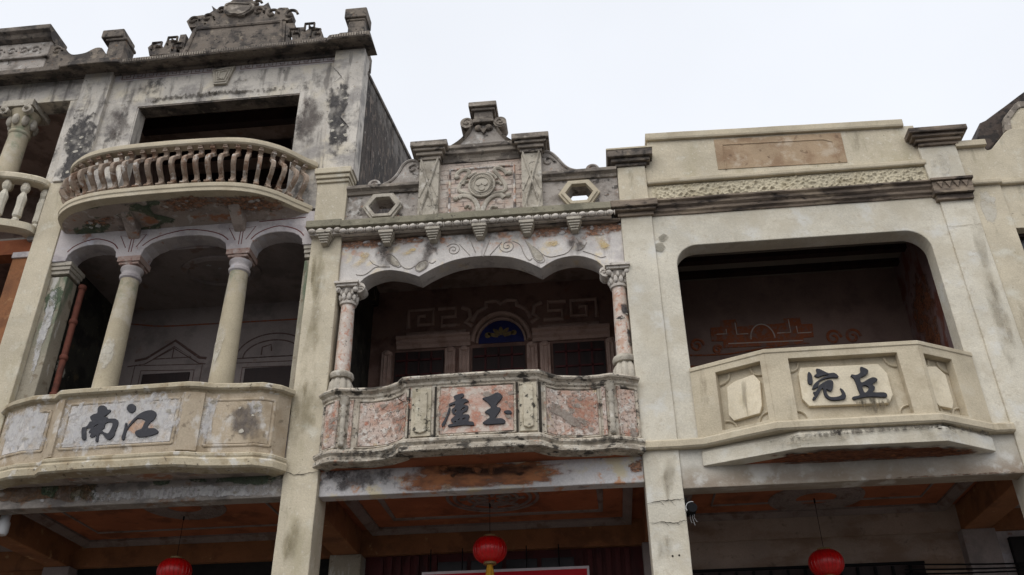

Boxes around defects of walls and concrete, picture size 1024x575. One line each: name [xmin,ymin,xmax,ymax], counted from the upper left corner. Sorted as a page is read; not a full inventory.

damp [297,84,349,145]
damp [61,112,97,182]
peeling [73,217,113,234]
peeling [125,196,283,230]
peeling [5,393,180,452]
peeling [550,393,598,431]
corrosion [404,461,562,491]
crack [651,498,687,526]